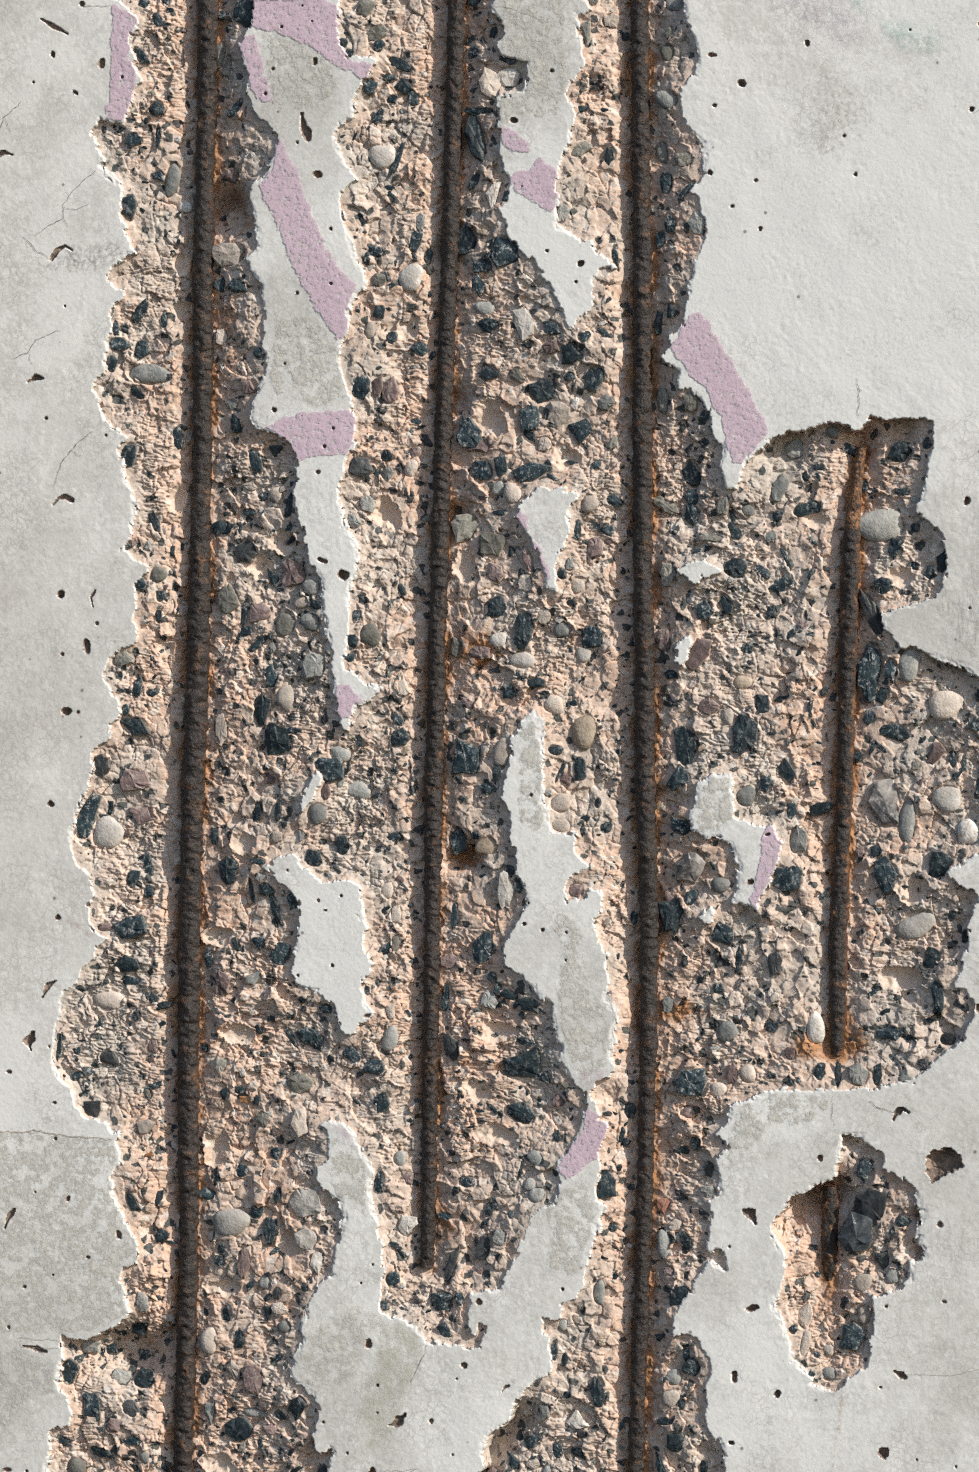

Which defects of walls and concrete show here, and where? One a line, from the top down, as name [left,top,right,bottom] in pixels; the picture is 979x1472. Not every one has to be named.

rust [194,135,222,217]
rust [651,458,661,541]
rust [844,445,870,512]
spalling [0,0,641,1472]
rust [442,728,480,870]
rust [422,631,501,724]
rust [633,646,701,1047]
spalling [627,0,979,1472]
rust [826,637,860,915]
rust [795,1000,866,1063]
rust [418,1165,459,1241]
rust [625,1066,661,1472]